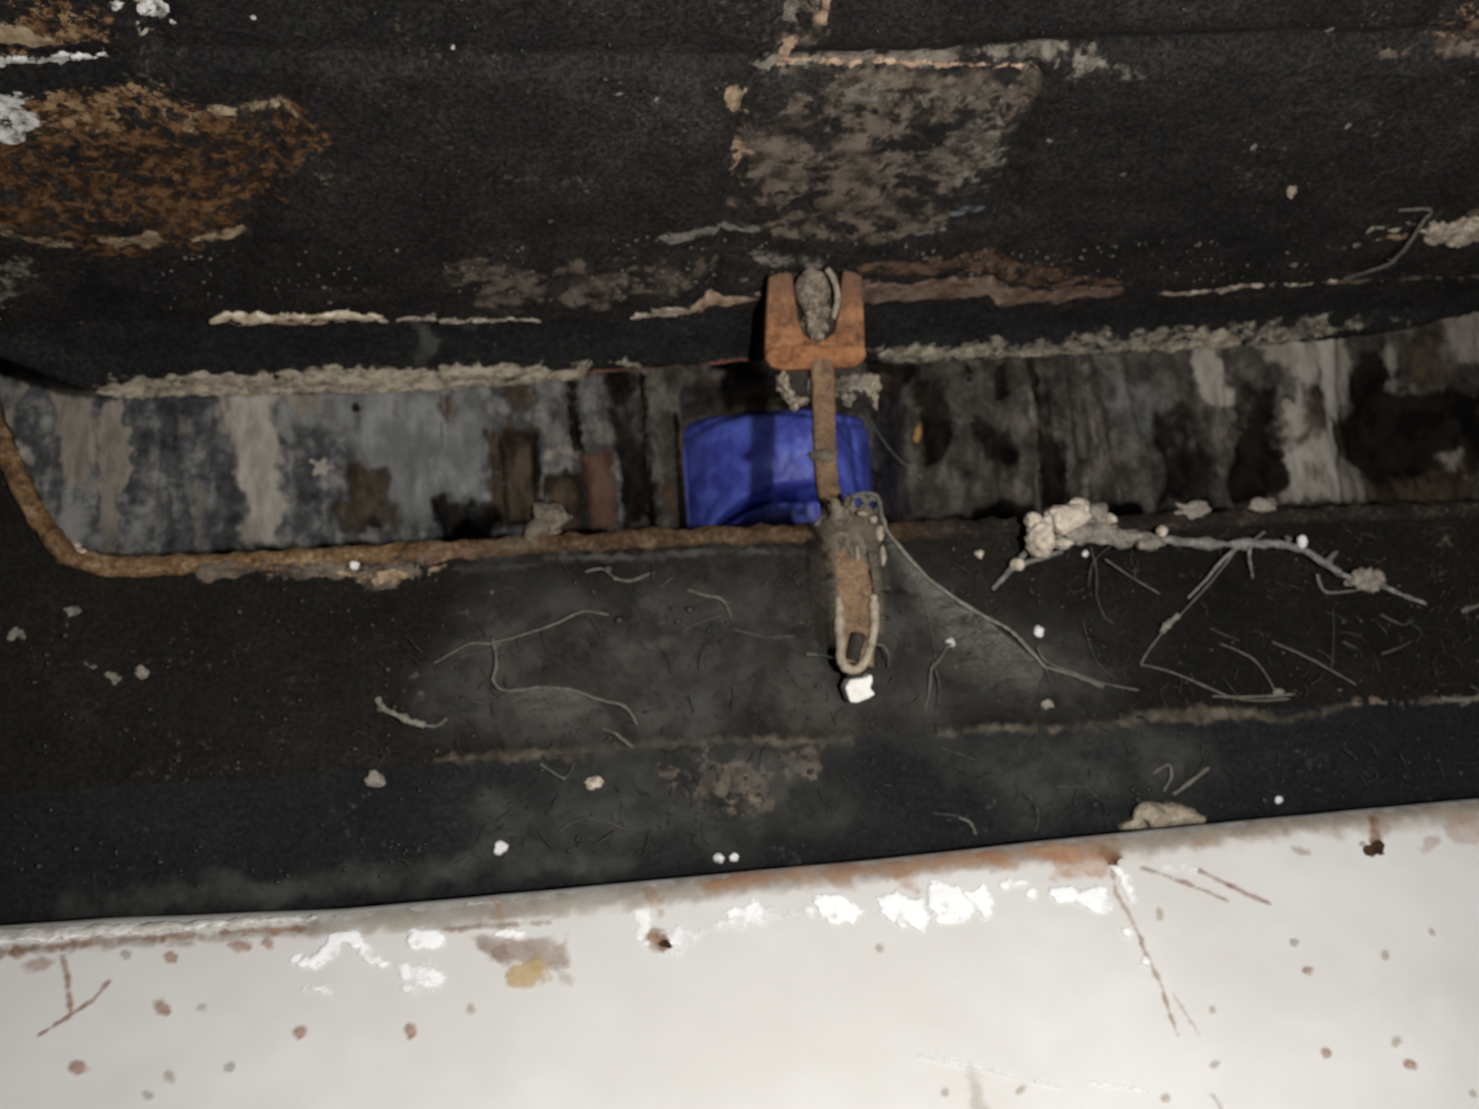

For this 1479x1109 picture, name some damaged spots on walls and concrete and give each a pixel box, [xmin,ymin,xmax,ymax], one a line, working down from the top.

flaking render [0,0,176,67]
flaking render [1421,3,1479,38]
flaking render [0,82,336,319]
spalling [83,0,1145,400]
leakage [1,362,136,555]
leakage [179,371,687,552]
leakage [1027,357,1103,512]
leakage [1153,348,1235,508]
leakage [1254,338,1367,506]
leakage [1382,312,1479,392]
rust [452,923,564,986]
rust [633,908,687,956]